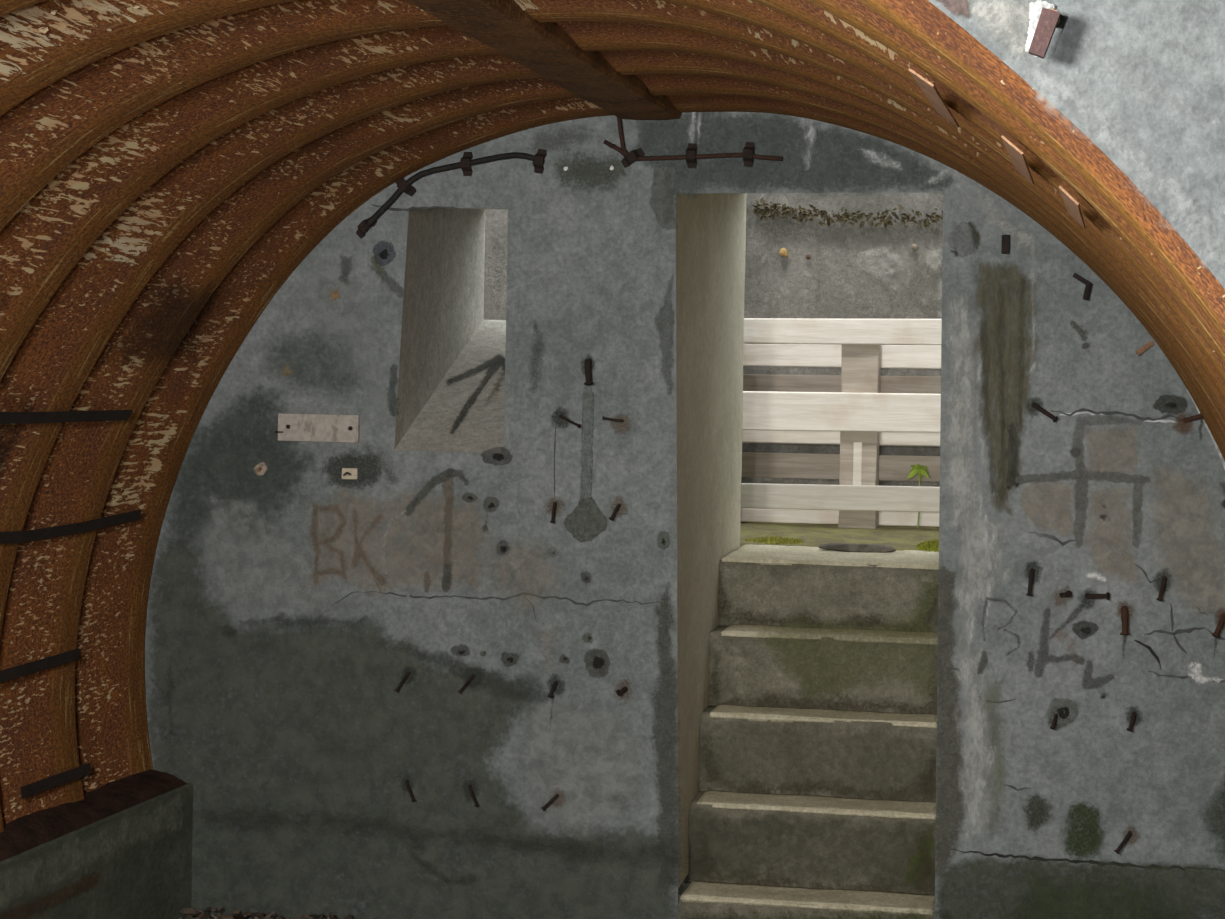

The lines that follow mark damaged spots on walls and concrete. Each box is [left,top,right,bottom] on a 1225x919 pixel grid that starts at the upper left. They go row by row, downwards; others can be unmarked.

peeling [514,0,539,12]
rust [939,0,970,17]
peeling [0,0,164,81]
peeling [82,215,168,266]
spalling [371,241,395,270]
crack [1050,408,1181,423]
water stain [0,266,1225,919]
crack [1132,563,1225,683]